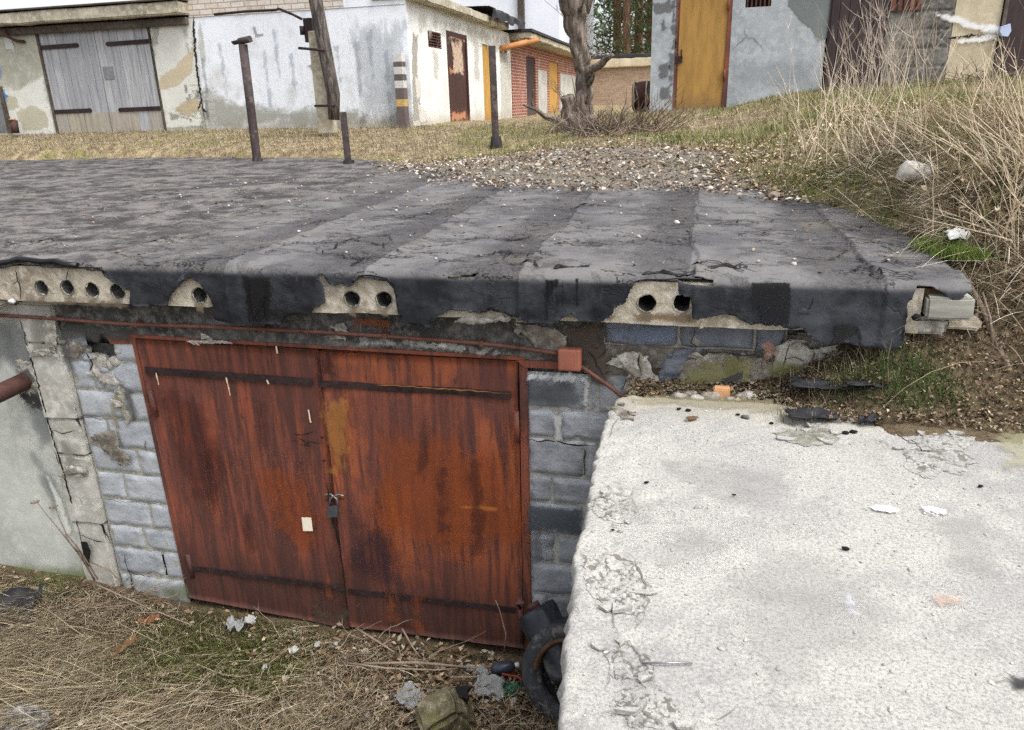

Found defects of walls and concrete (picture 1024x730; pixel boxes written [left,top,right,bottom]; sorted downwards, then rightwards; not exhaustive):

peeling [0,76,56,135]
peeling [151,18,203,128]
crack [192,18,206,119]
peeling [449,36,465,74]
spalling [15,313,133,425]
crack [0,196,267,589]
spalling [88,430,132,466]
spalling [775,422,842,447]
spalling [892,430,980,479]
spalling [591,486,637,527]
spalling [581,553,658,621]
spalling [591,639,696,730]